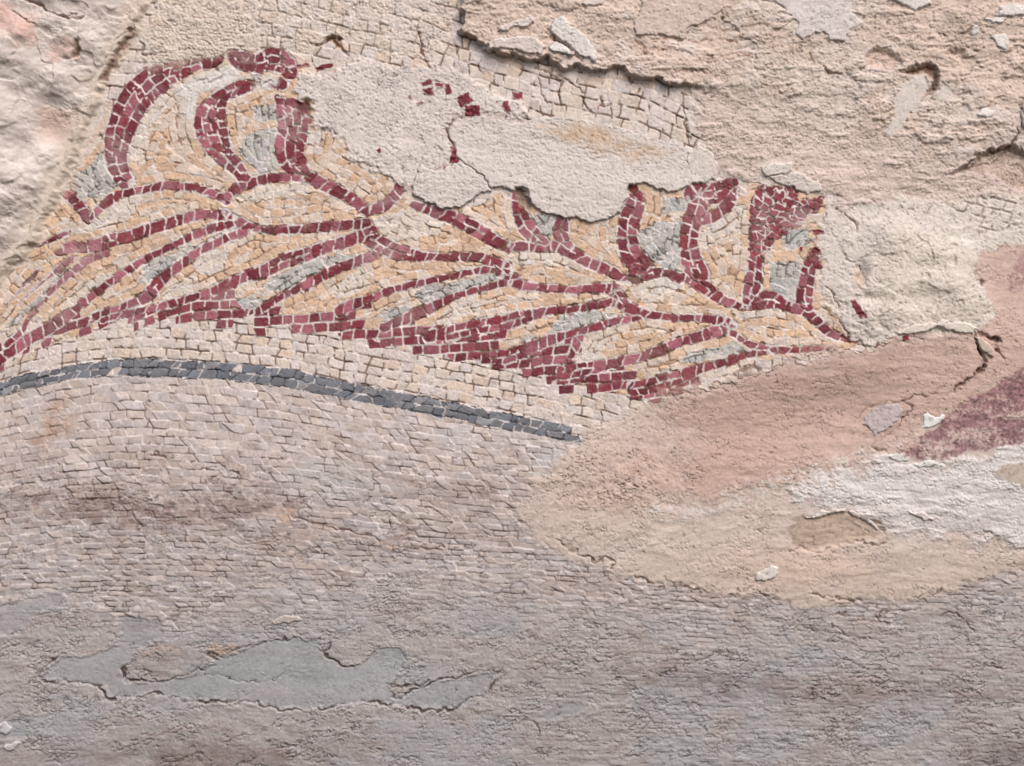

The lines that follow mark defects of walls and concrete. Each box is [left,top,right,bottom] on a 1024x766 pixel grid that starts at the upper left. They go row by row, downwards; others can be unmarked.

spalling [64,36,82,60]
spalling [96,23,138,84]
peeling [488,16,598,64]
peeling [763,0,863,42]
peeling [970,3,1024,50]
spalling [513,188,536,214]
spalling [627,184,638,198]
peeling [760,162,822,195]
crack [855,329,1006,452]
peeling [920,413,945,429]
spalling [785,508,888,556]
crack [38,636,507,715]